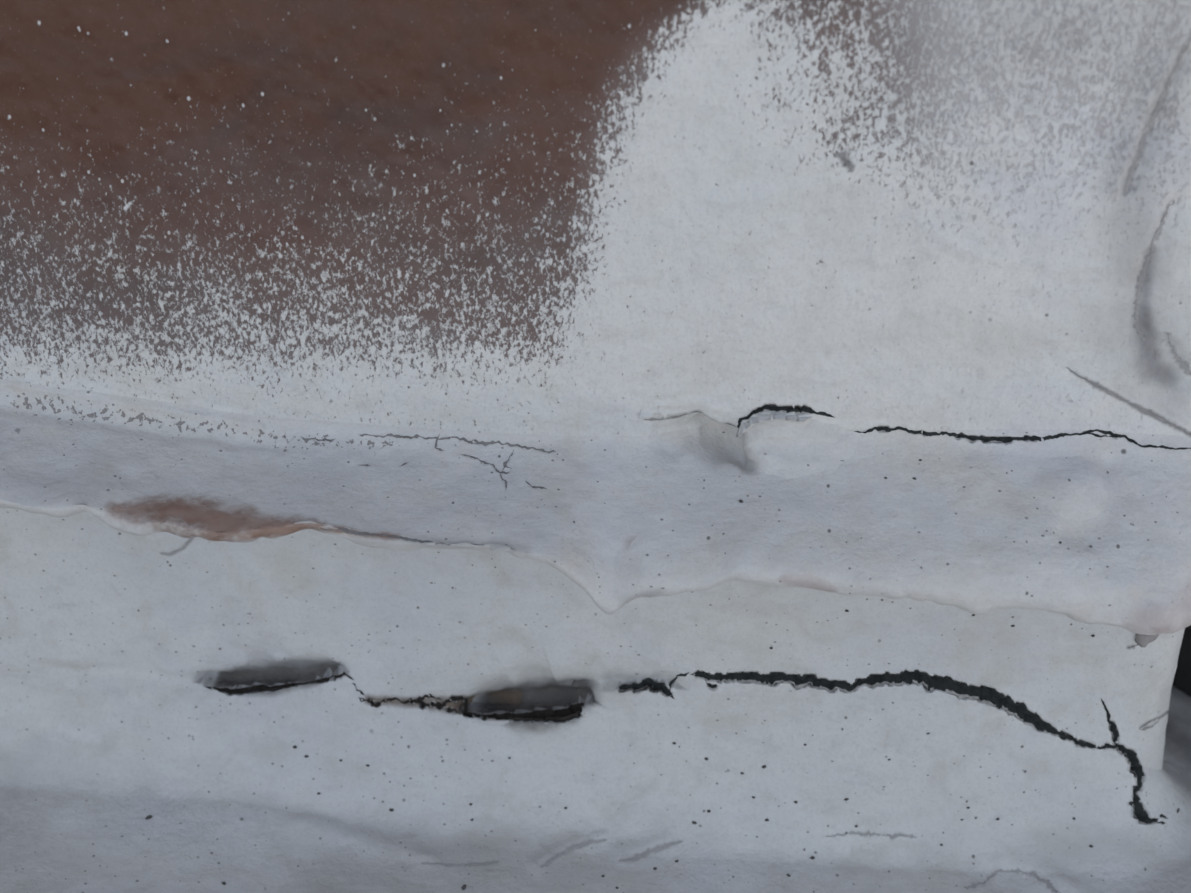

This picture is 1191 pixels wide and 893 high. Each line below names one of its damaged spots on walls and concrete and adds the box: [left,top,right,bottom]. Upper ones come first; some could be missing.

crack [644,411,701,421]
crack [727,405,1191,450]
corrosion [112,499,349,541]
crack [352,683,490,720]
peeling [580,684,618,720]
crack [619,670,1169,824]
crack [827,831,916,839]